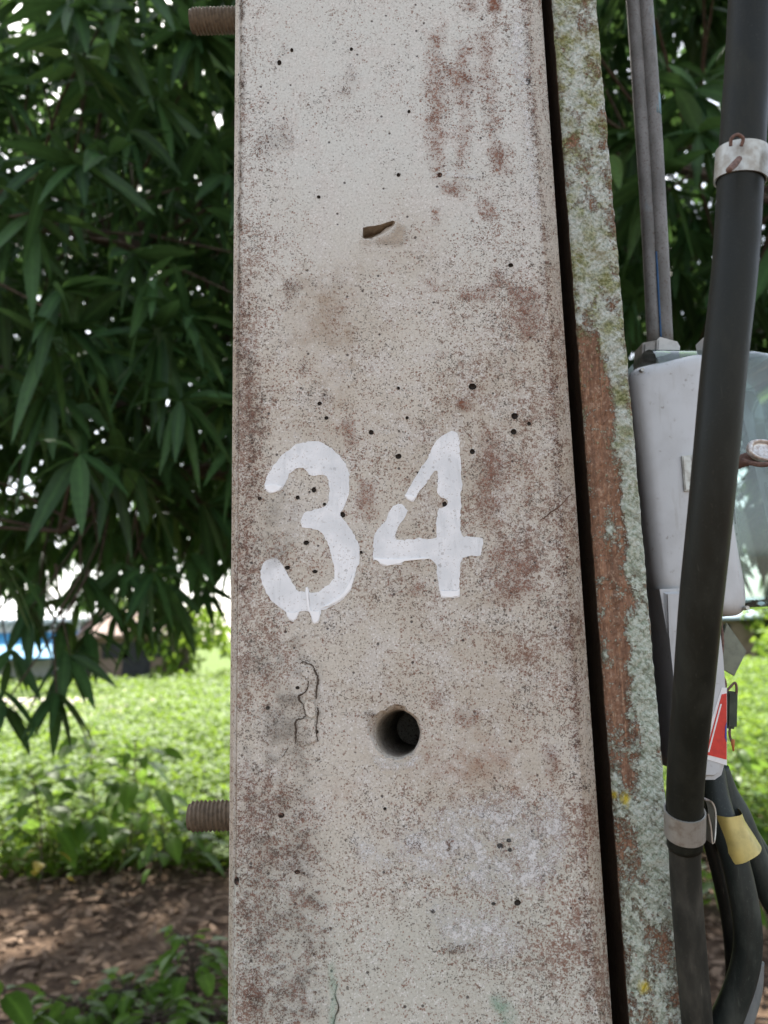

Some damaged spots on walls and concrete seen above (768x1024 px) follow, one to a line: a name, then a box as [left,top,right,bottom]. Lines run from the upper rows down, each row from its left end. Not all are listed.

rust [419,21,517,223]
rust [459,0,597,1024]
crack [281,661,319,758]